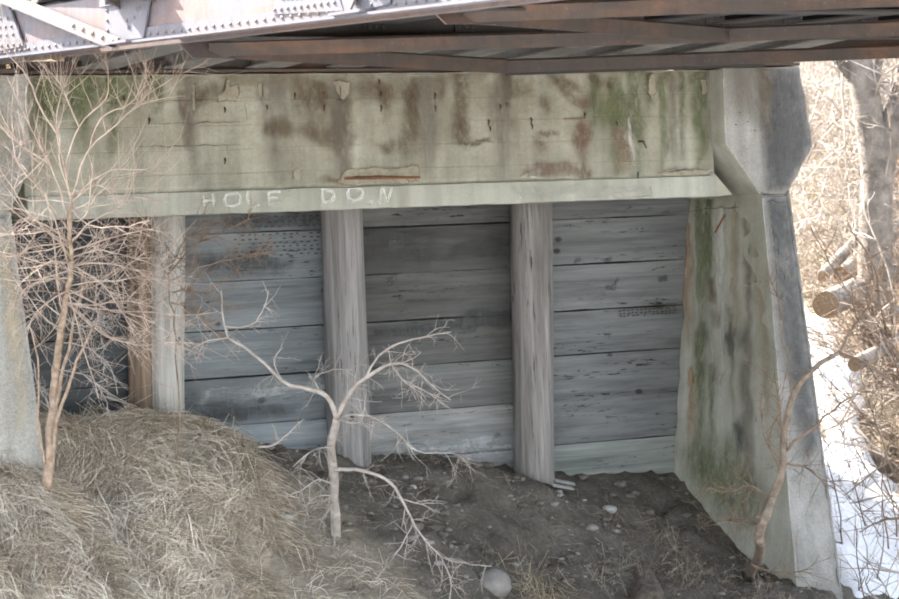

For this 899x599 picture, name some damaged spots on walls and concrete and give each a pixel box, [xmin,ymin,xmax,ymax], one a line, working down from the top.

damp [297,82,349,144]
damp [359,82,418,140]
damp [454,82,467,137]
damp [593,71,684,153]
damp [691,200,768,431]